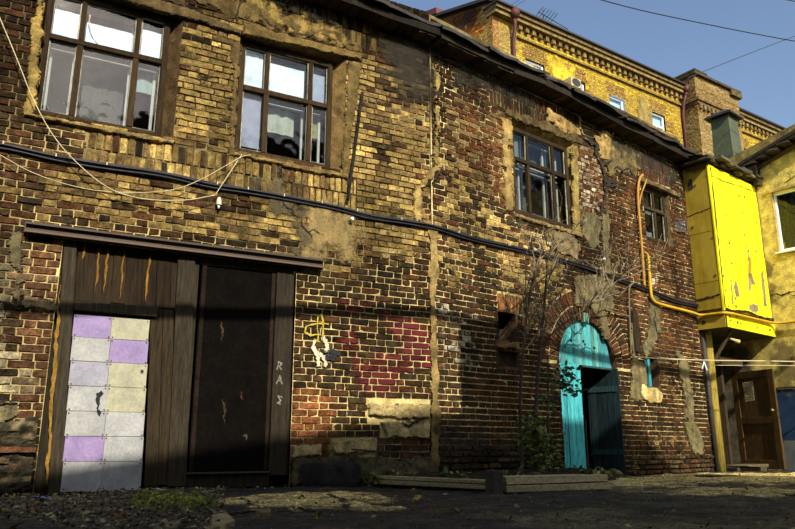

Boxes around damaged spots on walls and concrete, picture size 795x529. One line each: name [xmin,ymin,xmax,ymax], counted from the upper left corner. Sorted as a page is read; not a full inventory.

peeling [545,108,642,176]
peeling [748,271,767,313]
peeling [641,384,663,404]
spalling [0,406,38,494]